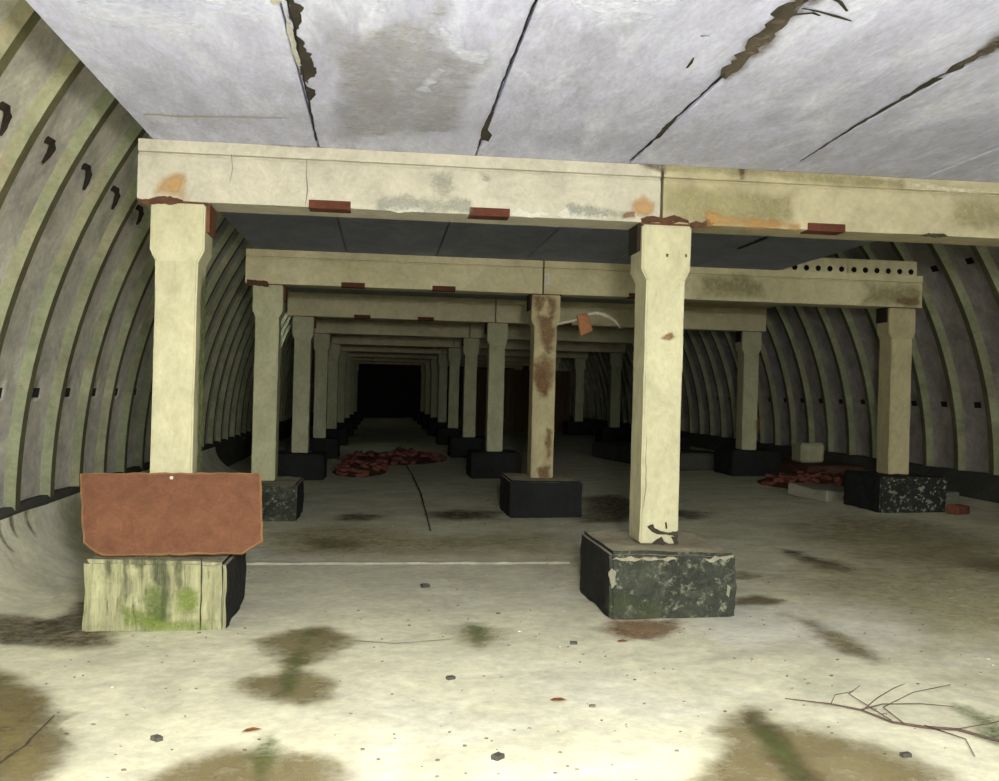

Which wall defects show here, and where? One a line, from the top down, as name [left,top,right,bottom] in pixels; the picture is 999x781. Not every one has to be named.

crack [286,0,317,205]
water stain [345,27,487,134]
crack [477,0,538,149]
rust [161,176,182,192]
rust [624,199,652,217]
rust [534,297,556,396]
water stain [124,556,182,620]
water stain [241,627,349,704]
water stain [0,673,63,781]
water stain [152,752,343,781]
water stain [701,712,937,781]